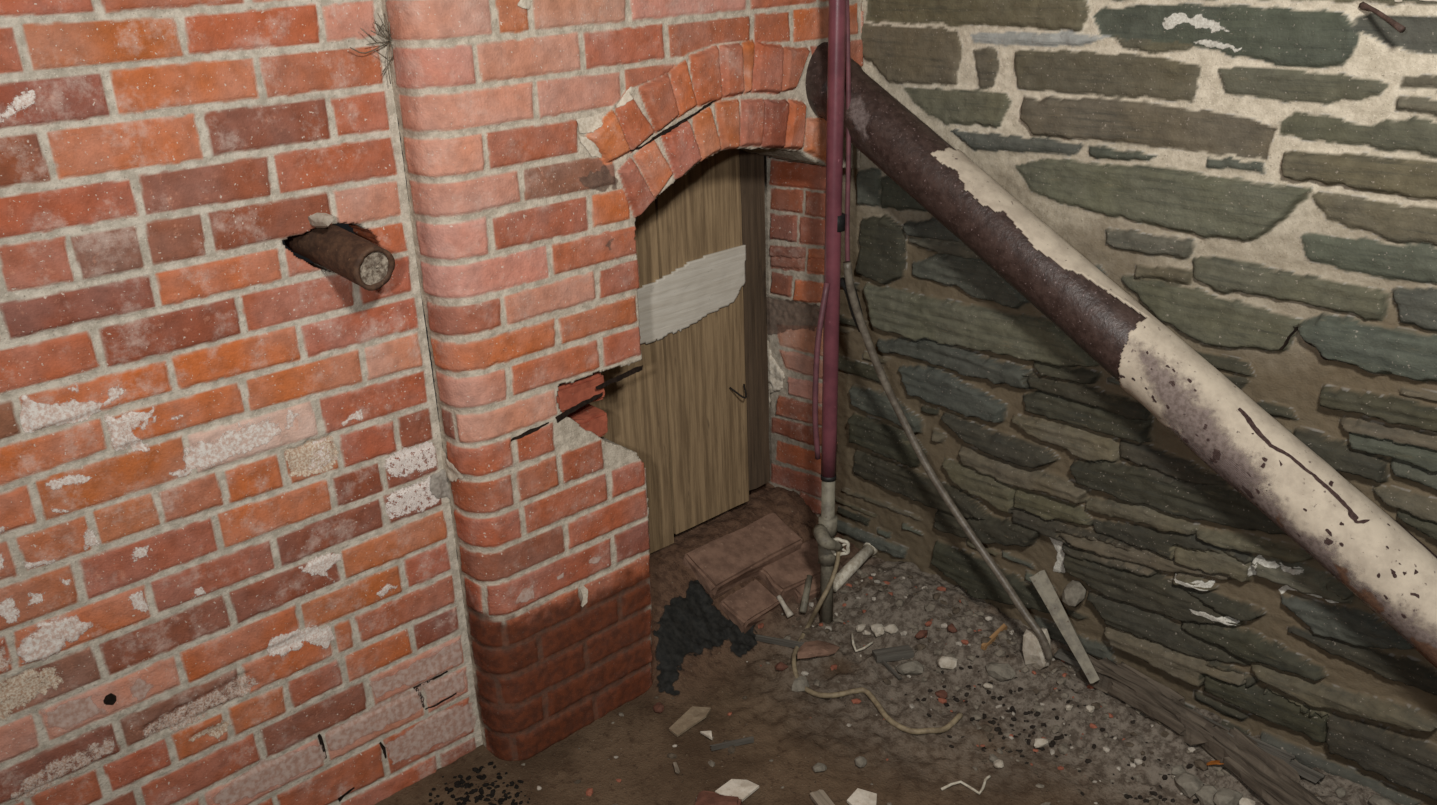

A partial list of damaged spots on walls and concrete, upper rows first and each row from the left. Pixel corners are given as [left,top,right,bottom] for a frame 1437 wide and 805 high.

peeling [518,0,532,10]
damp [0,88,36,122]
damp [20,383,183,452]
damp [169,410,300,477]
spalling [556,372,608,437]
damp [46,474,92,490]
damp [383,441,440,519]
damp [132,545,149,562]
damp [0,592,45,624]
damp [0,615,93,672]
damp [213,572,653,805]
damp [11,737,115,802]